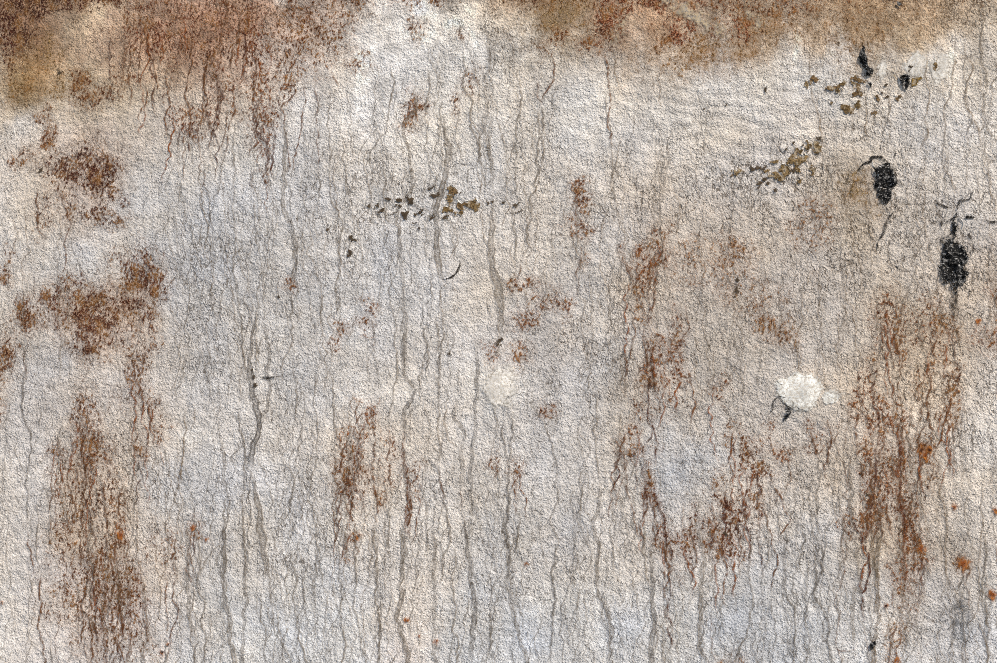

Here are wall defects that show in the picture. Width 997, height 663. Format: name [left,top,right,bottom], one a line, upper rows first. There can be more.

corrosion [7,104,130,243]
corrosion [0,0,373,204]
damp [383,84,450,273]
corrosion [551,0,825,56]
damp [649,0,948,81]
corrosion [0,245,172,663]
damp [159,528,207,663]
damp [220,316,307,663]
damp [336,399,477,663]
damp [623,459,673,663]
corrosion [609,224,800,644]
corrosion [835,286,964,663]